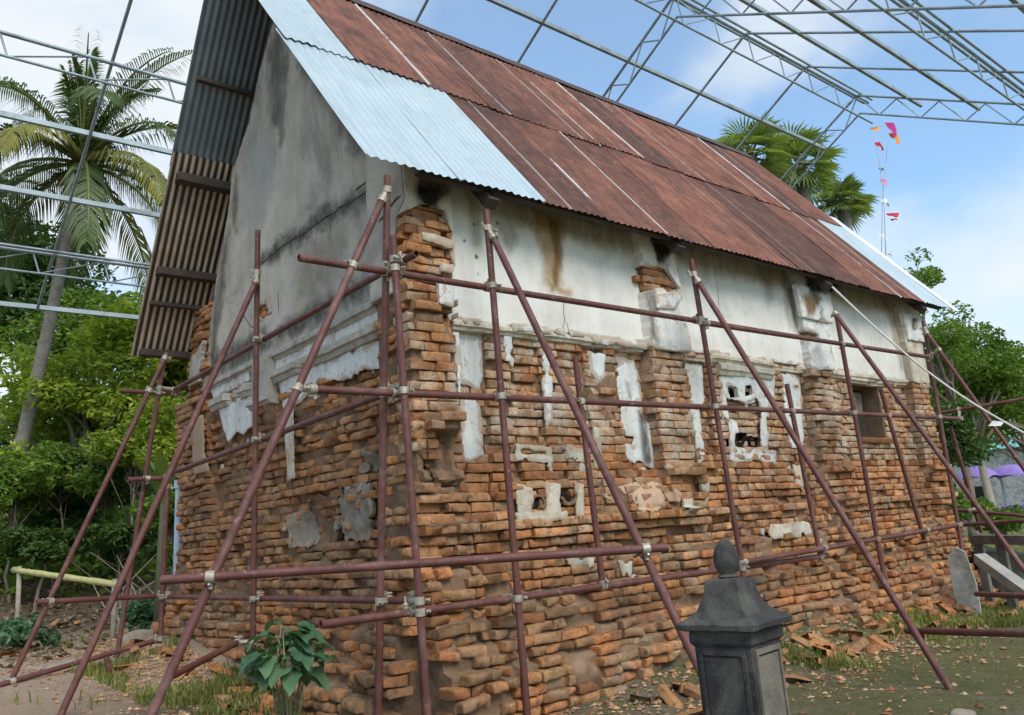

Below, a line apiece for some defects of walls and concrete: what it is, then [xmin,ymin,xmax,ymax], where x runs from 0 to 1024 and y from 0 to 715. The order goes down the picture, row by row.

water stain [268,33,286,124]
water stain [339,119,365,153]
crack [260,182,401,265]
spalling [393,181,465,316]
corrosion [536,212,570,334]
flaking render [219,395,253,442]
flaking render [279,340,380,481]
flaking render [392,318,484,486]
flaking render [514,426,602,522]
flaking render [503,323,674,470]
flaking render [683,362,706,464]
flaking render [718,373,804,491]